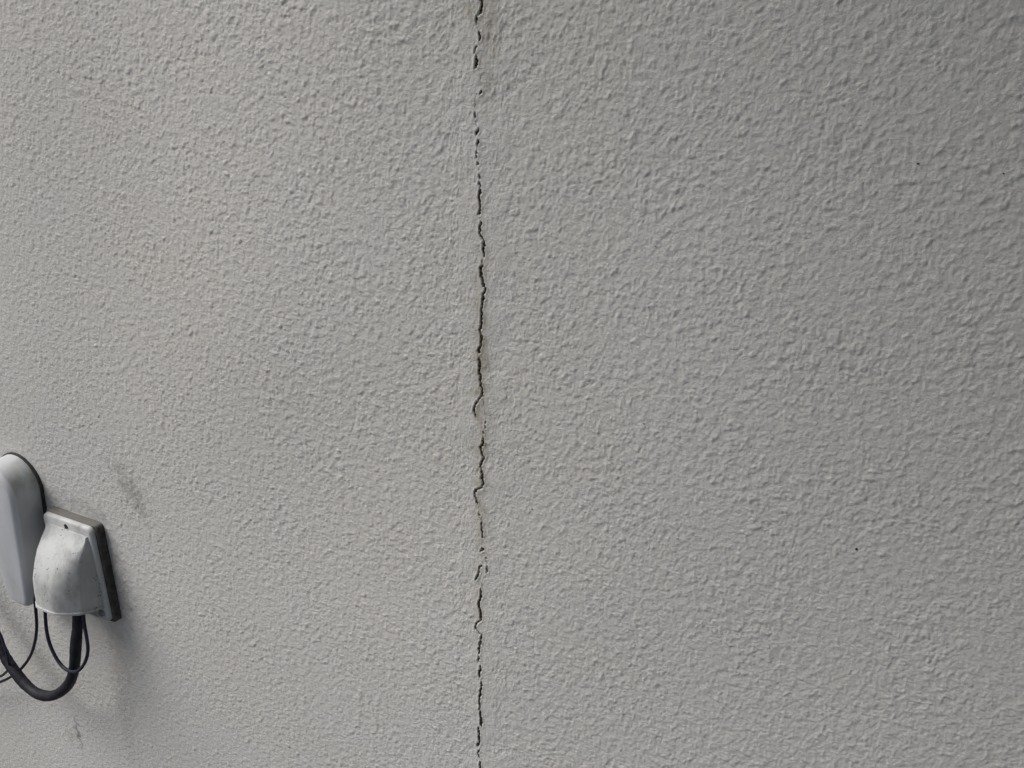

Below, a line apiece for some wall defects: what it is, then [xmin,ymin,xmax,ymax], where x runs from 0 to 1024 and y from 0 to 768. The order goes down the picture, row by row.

crack [469,0,488,768]